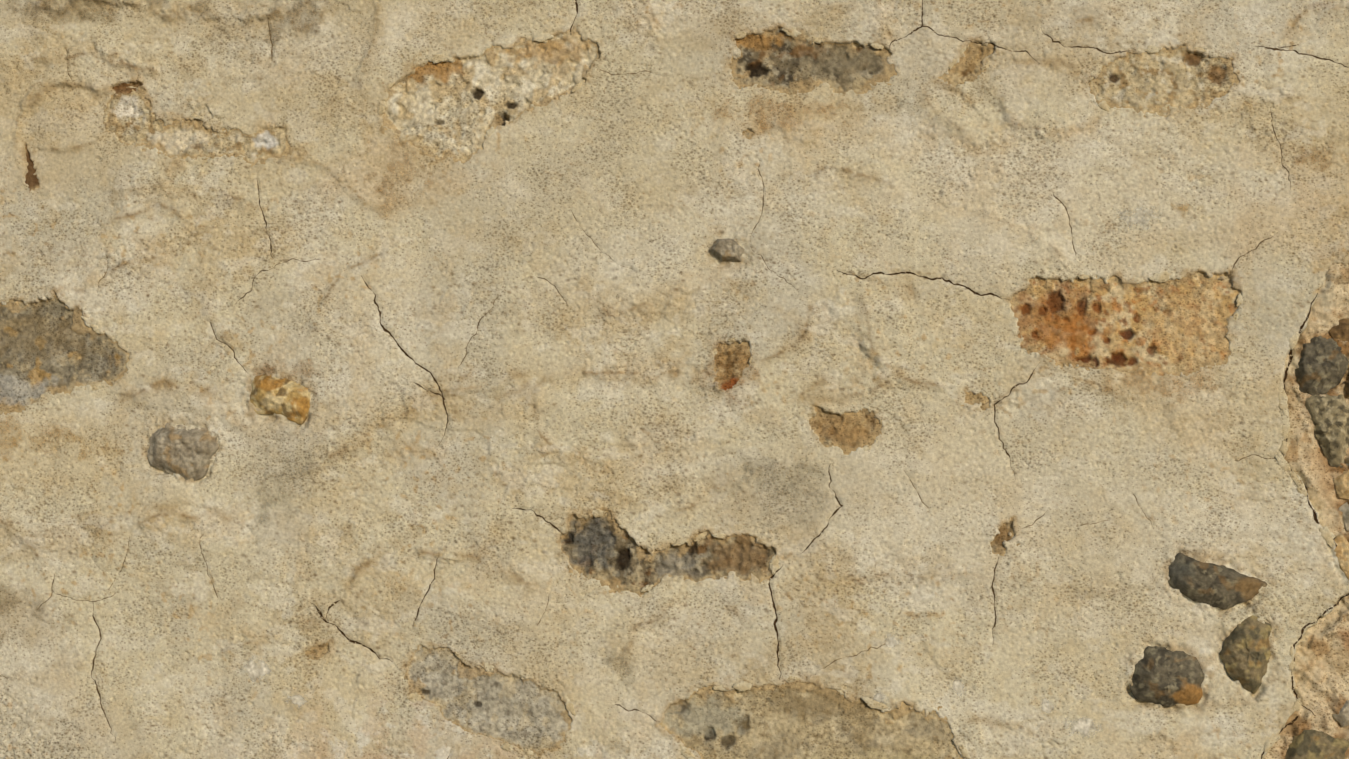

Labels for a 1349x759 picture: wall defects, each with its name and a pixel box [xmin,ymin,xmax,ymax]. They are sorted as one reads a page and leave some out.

spalling [378,30,600,163]
spalling [728,26,897,96]
spalling [1086,45,1239,118]
spalling [0,294,129,415]
crack [362,277,499,444]
spalling [809,406,882,455]
spalling [1010,271,1243,376]
spalling [1275,263,1349,548]
spalling [560,509,779,597]
spalling [404,644,576,758]
spalling [660,676,970,759]
spalling [1263,595,1349,759]